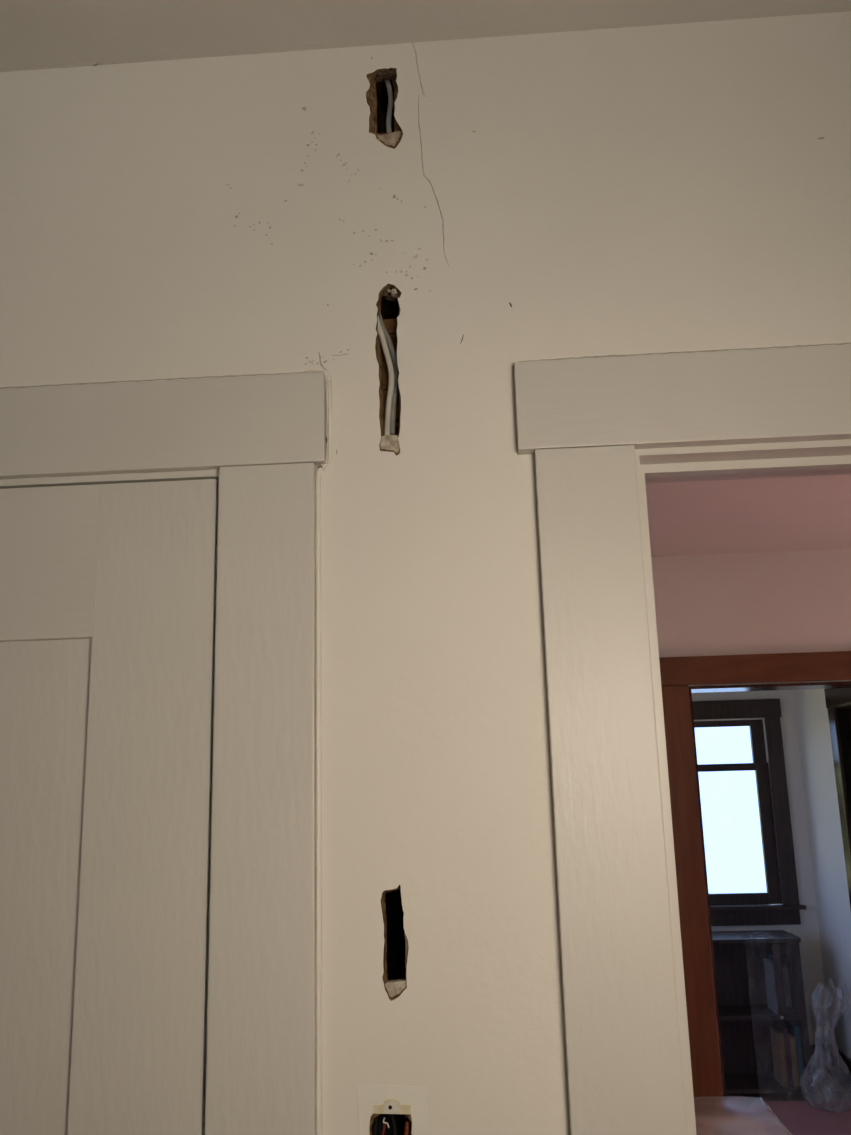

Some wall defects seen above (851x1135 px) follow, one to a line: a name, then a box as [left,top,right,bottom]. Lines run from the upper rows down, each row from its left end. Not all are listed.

crack [412,43,449,266]